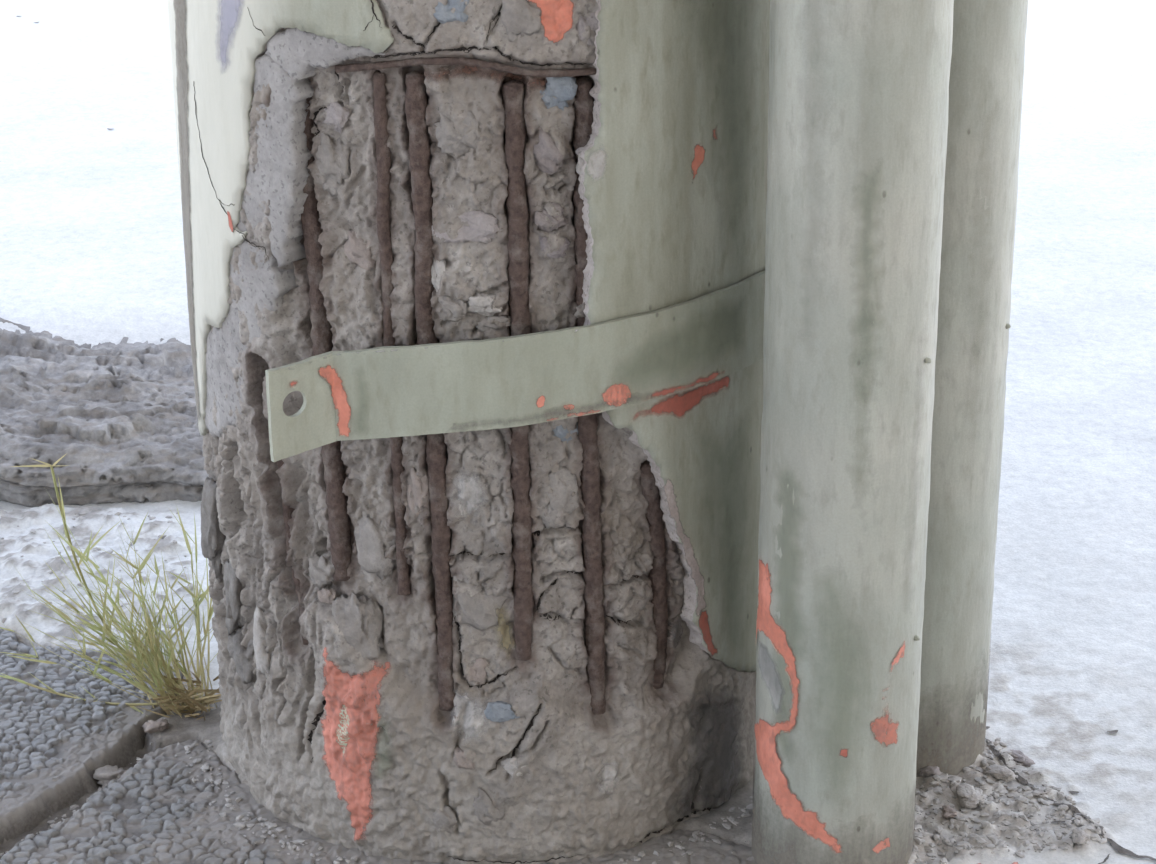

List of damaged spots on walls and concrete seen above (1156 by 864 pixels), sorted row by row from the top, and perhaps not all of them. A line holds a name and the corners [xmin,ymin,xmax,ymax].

rust [428,65,547,88]
crack [193,84,269,258]
spalling [201,0,841,864]
crack [535,571,579,621]
crack [489,704,541,772]
peeling [870,714,899,747]
crack [985,738,1156,864]